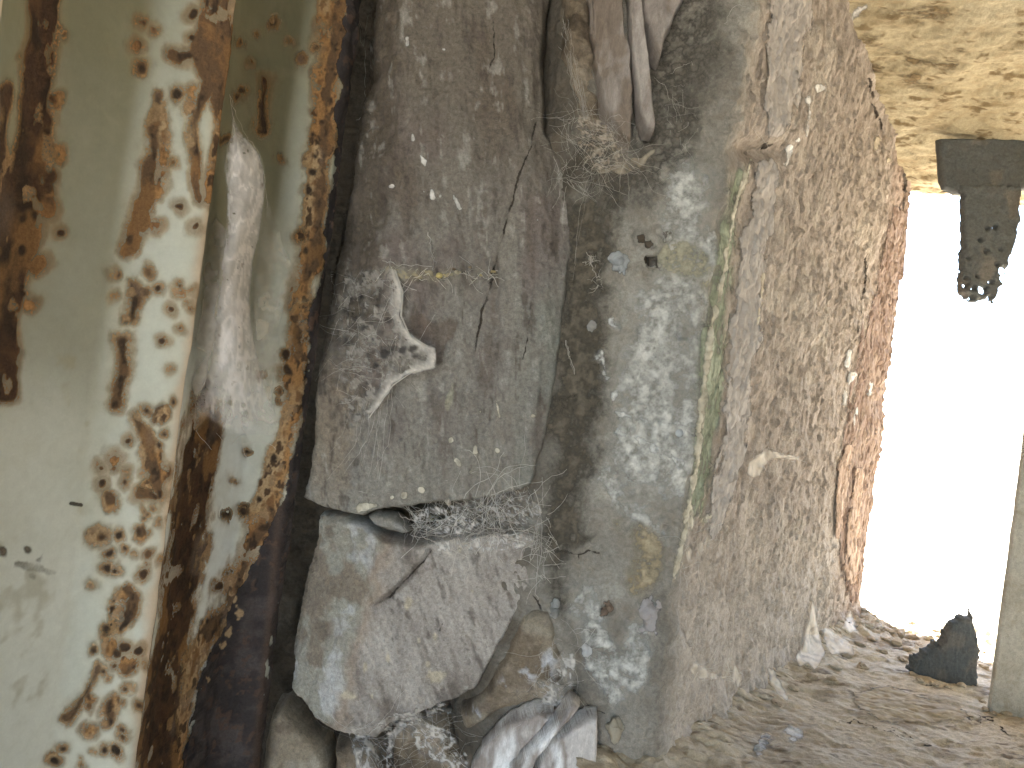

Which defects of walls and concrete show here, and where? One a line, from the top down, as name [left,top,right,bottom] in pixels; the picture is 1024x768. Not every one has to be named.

rust [0,0,67,405]
crack [503,123,536,236]
crack [475,265,495,351]
rust [58,0,347,768]
crack [388,551,431,598]
rust [44,744,69,768]